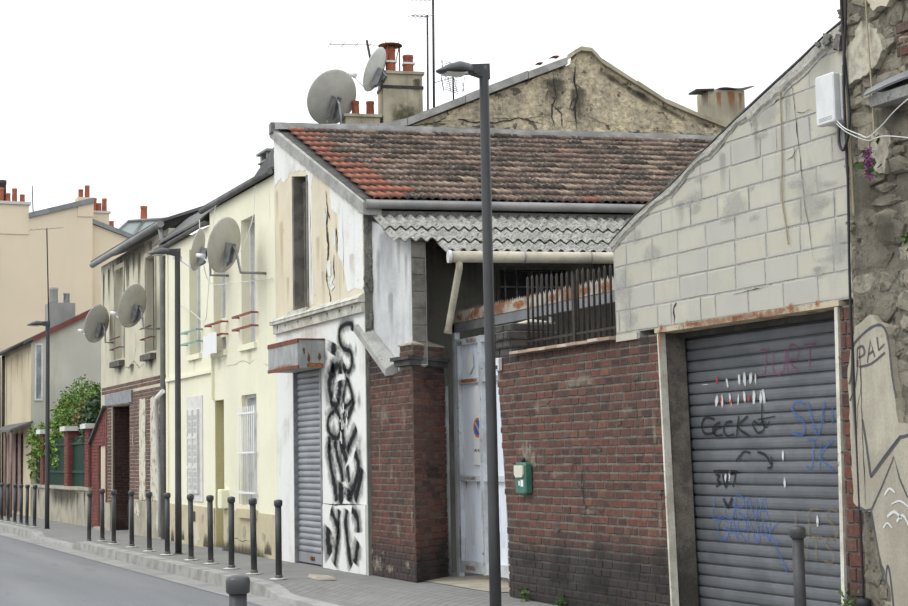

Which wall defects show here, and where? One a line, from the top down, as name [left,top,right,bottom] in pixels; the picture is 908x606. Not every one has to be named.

crack [414,66,581,129]
leakage [545,78,584,111]
leakage [607,74,680,117]
peeling [274,142,313,305]
crack [310,200,344,302]
peeling [323,187,374,293]